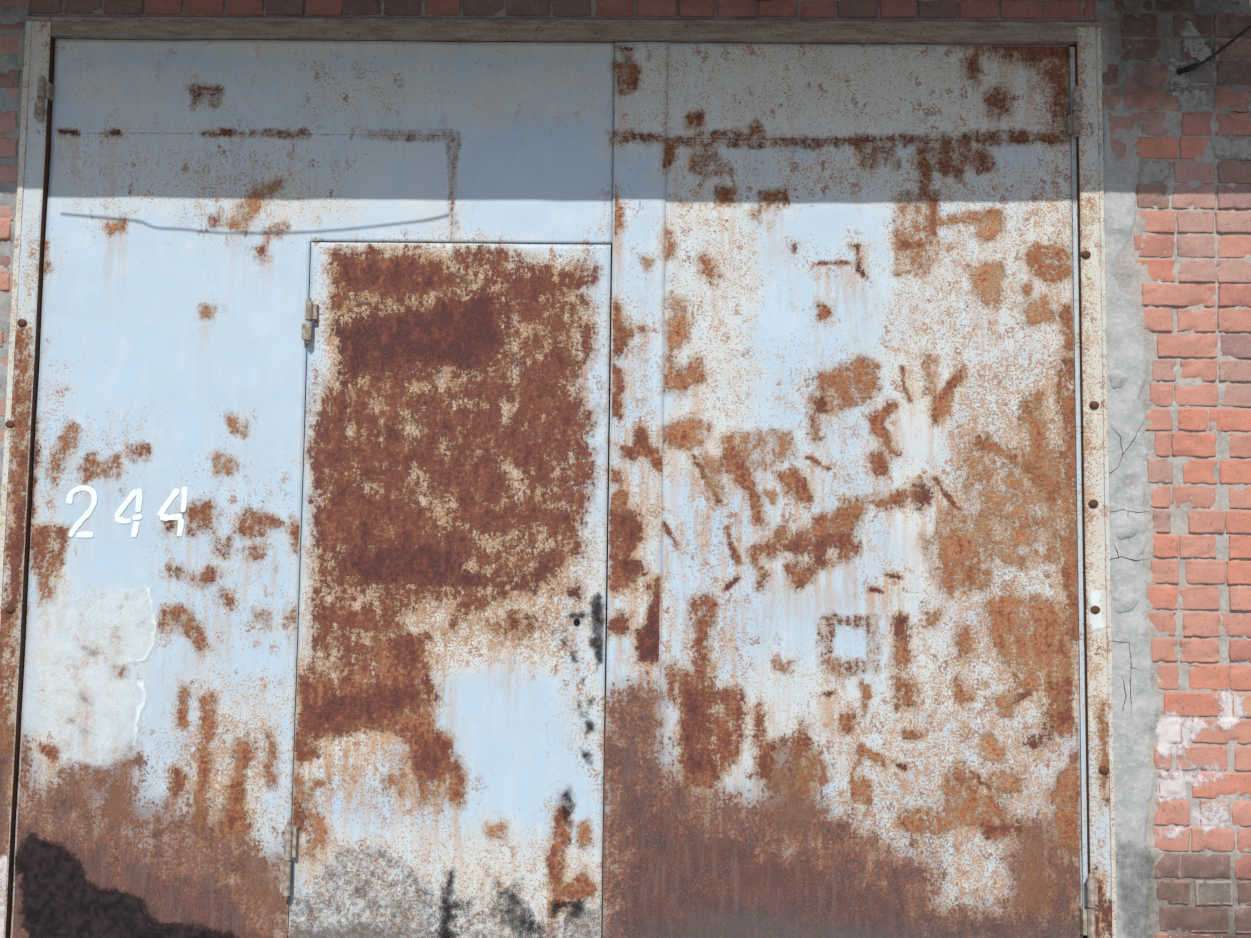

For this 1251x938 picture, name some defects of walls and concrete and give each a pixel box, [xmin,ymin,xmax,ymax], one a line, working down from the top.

rust [190,81,223,108]
rust [105,220,128,235]
rust [208,178,283,237]
rust [202,128,311,139]
rust [256,222,290,262]
rust [376,131,460,225]
rust [610,45,1070,278]
crack [1109,417,1146,474]
rust [0,241,1112,938]
damp [1153,689,1248,839]